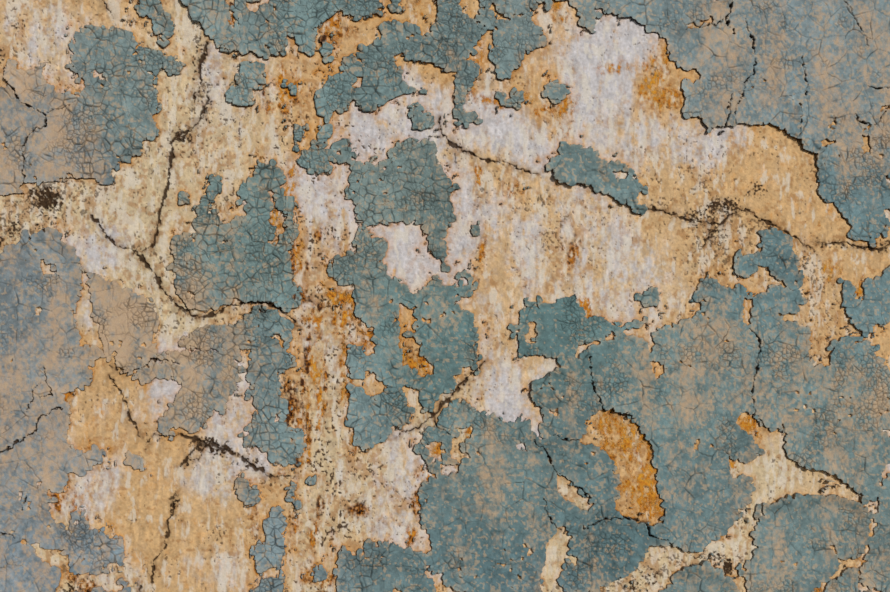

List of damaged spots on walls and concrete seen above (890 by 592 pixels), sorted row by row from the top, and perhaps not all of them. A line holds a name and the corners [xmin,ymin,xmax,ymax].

crack [90,42,296,323]
crack [438,117,531,174]
peeling [324,0,890,371]
crack [648,206,890,253]
peeling [0,0,562,592]
crack [109,367,289,477]
corrosion [309,495,324,549]
corrosion [284,289,373,463]
corrosion [348,503,366,515]
peeling [539,526,578,592]
corrosion [598,409,664,526]
peeling [588,411,890,592]